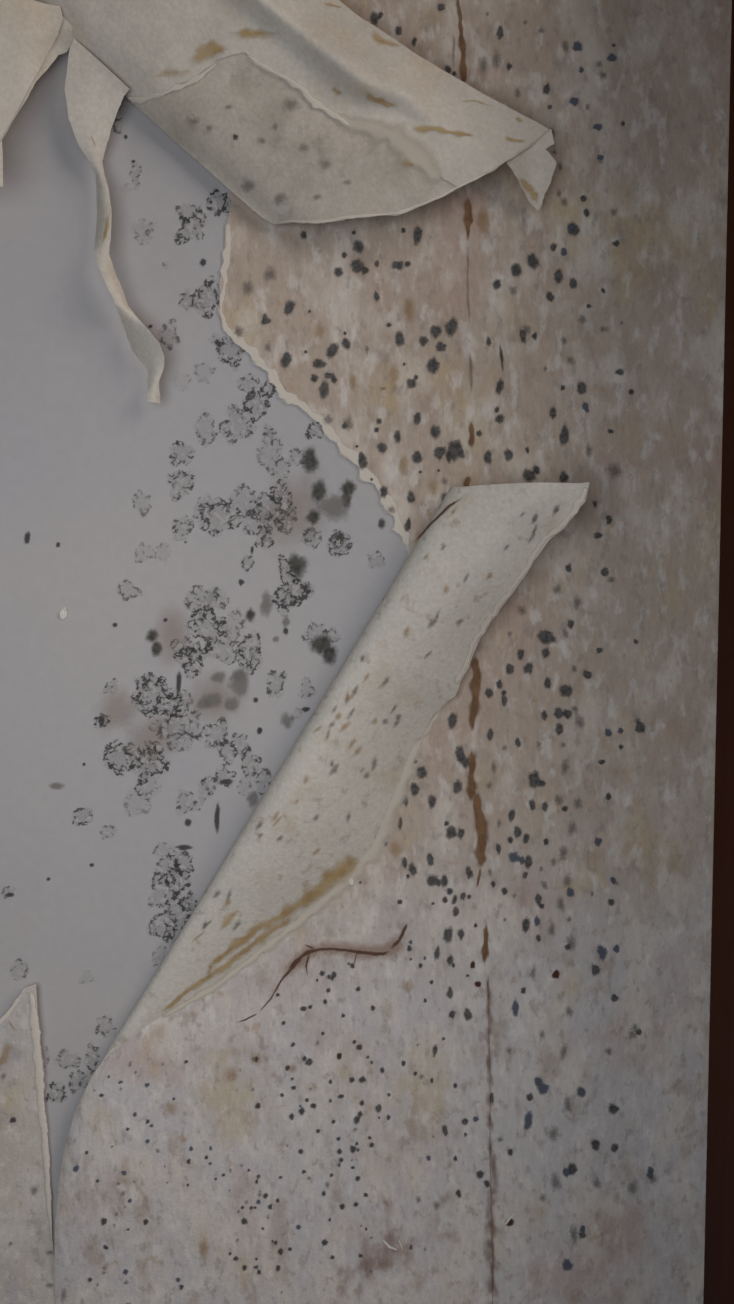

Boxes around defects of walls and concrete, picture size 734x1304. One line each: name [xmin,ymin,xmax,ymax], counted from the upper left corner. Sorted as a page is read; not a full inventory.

damp [175,189,231,244]
damp [334,231,410,276]
damp [493,254,538,289]
damp [546,195,589,301]
damp [403,319,457,388]
damp [487,337,504,423]
damp [356,419,400,497]
damp [412,413,539,482]
damp [103,332,354,830]
damp [541,677,572,735]
damp [529,771,567,811]
damp [149,845,197,945]